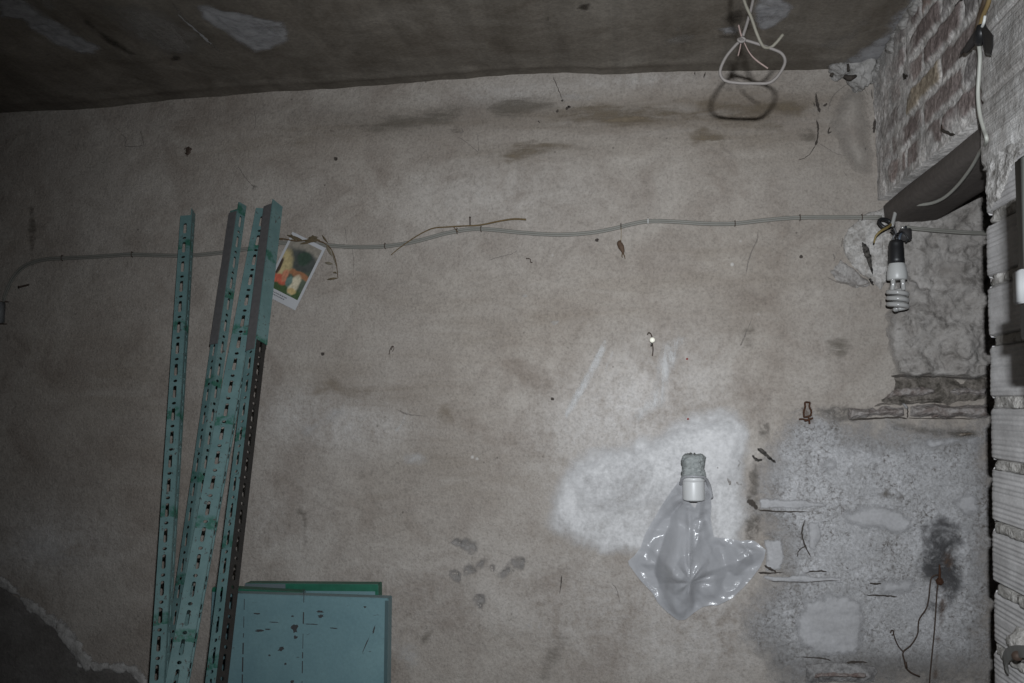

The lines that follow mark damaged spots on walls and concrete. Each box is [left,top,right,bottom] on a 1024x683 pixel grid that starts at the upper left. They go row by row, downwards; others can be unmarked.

flaking render [830,208,892,290]
spalling [736,376,995,683]
water stain [922,519,961,596]
flaking render [0,576,147,683]